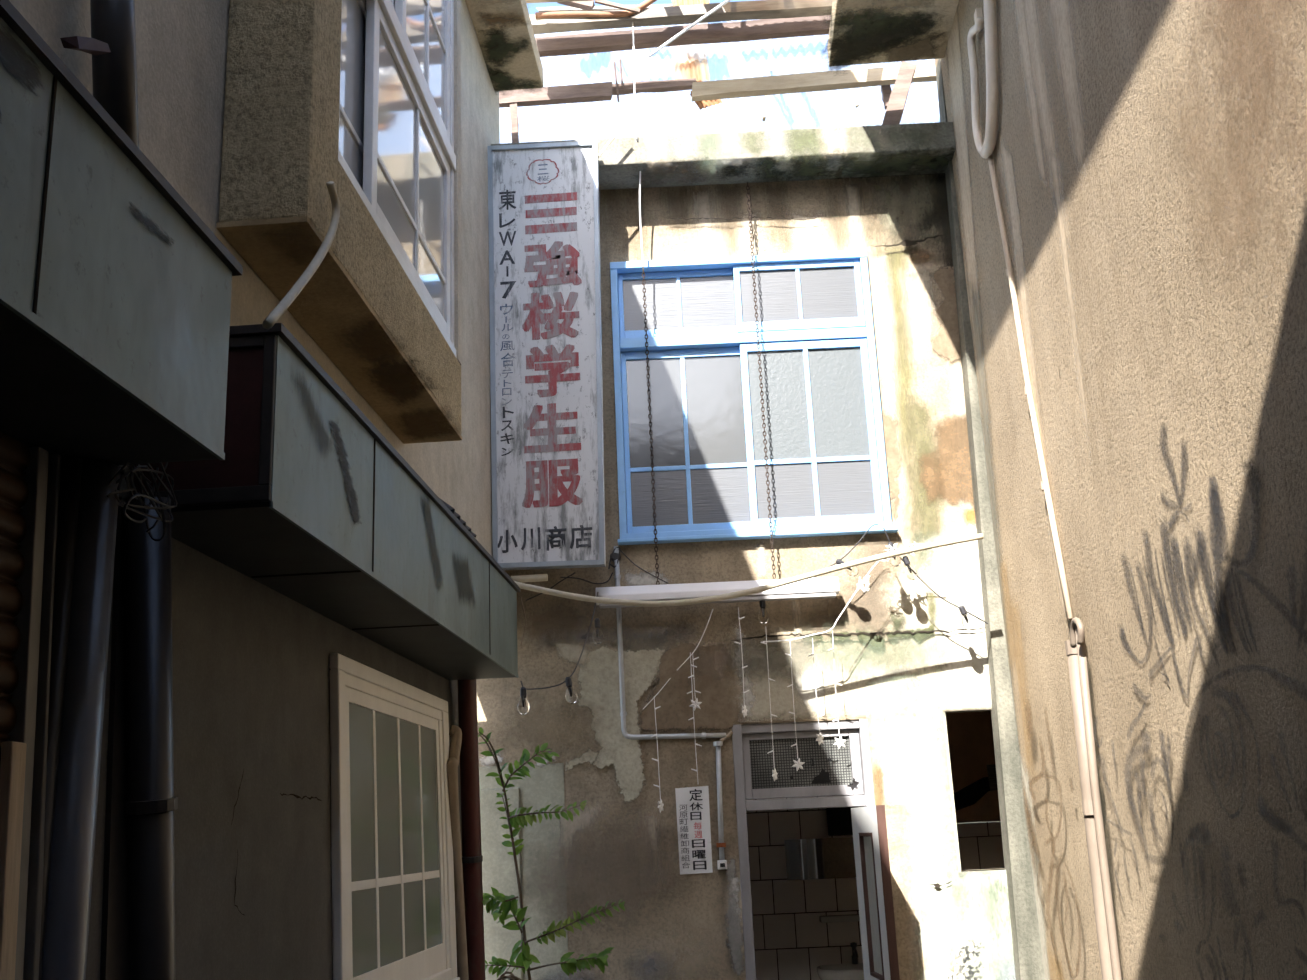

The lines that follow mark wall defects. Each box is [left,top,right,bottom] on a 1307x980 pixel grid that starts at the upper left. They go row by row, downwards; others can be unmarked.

water stain [480,0,544,95]
water stain [646,140,718,258]
water stain [1015,0,1090,443]
water stain [723,0,1019,745]
water stain [1002,143,1048,475]
water stain [1046,505,1078,621]
peeling [537,643,665,803]
water stain [1021,764,1050,980]
water stain [948,944,981,980]
water stain [1001,963,1016,980]